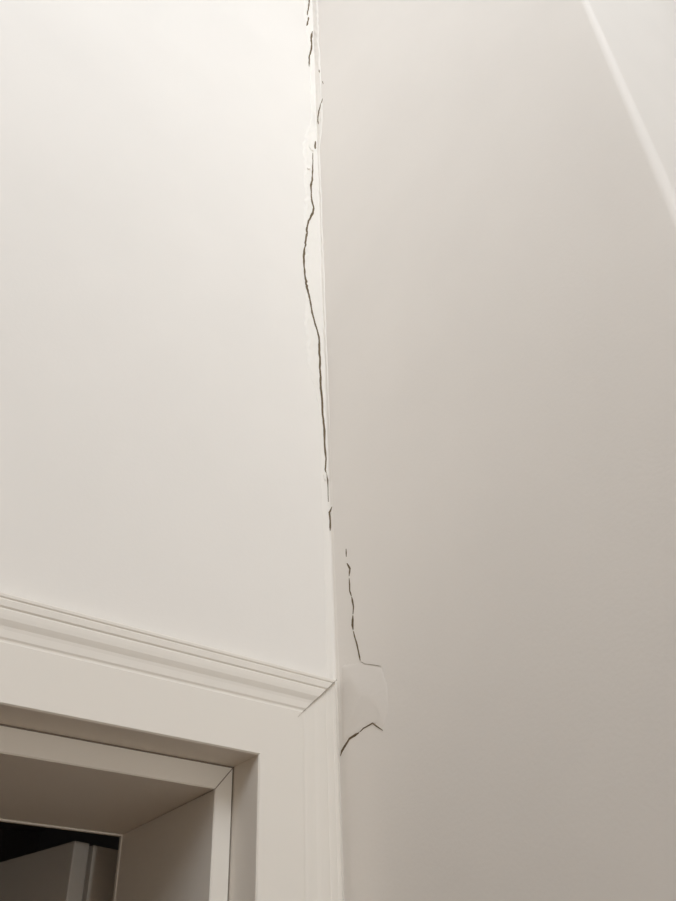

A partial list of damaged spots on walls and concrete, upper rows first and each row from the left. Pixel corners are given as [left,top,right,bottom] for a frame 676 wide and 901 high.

crack [303,0,332,530]
crack [346,549,378,666]
crack [340,722,383,756]